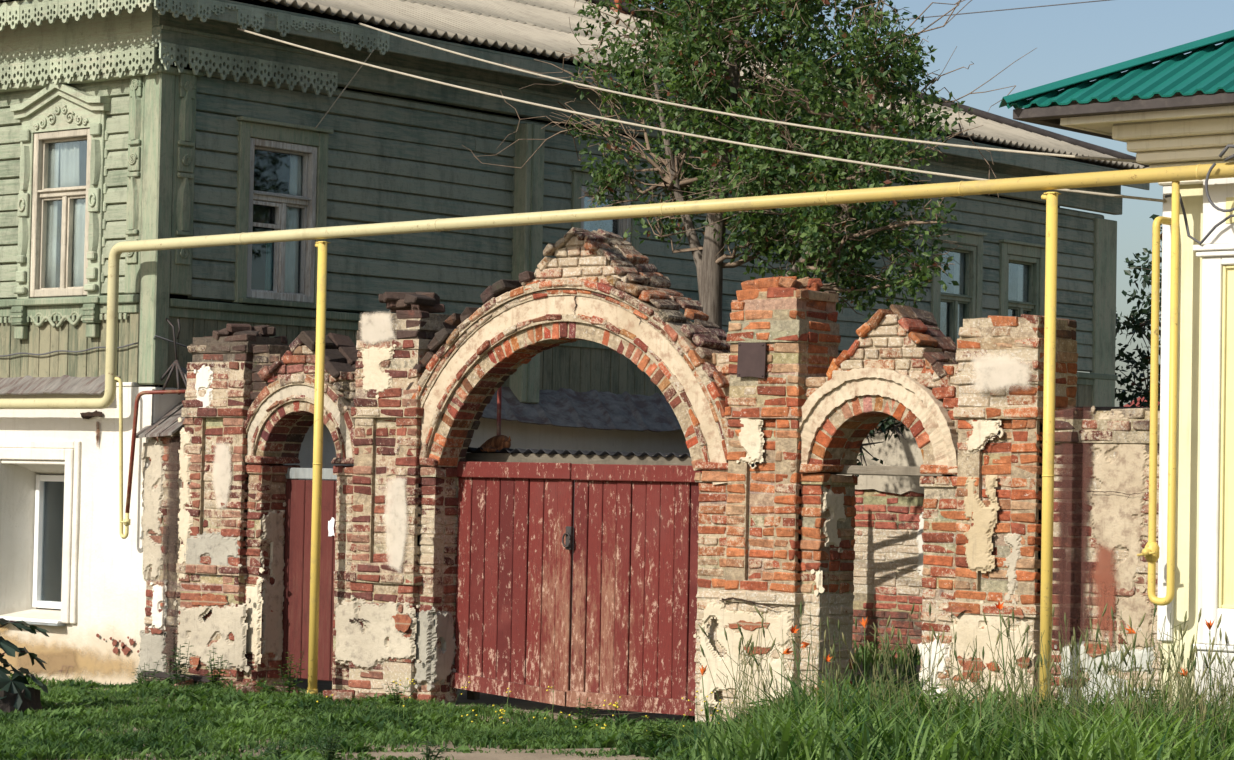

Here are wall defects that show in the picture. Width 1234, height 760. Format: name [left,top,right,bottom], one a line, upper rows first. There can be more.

damp [1062,408,1091,419]
damp [1055,443,1092,652]
spalling [173,593,228,607]
spalling [392,605,421,633]
spalling [943,601,985,617]
spalling [1004,593,1024,619]
peeling [96,634,140,655]
spalling [1017,652,1037,668]